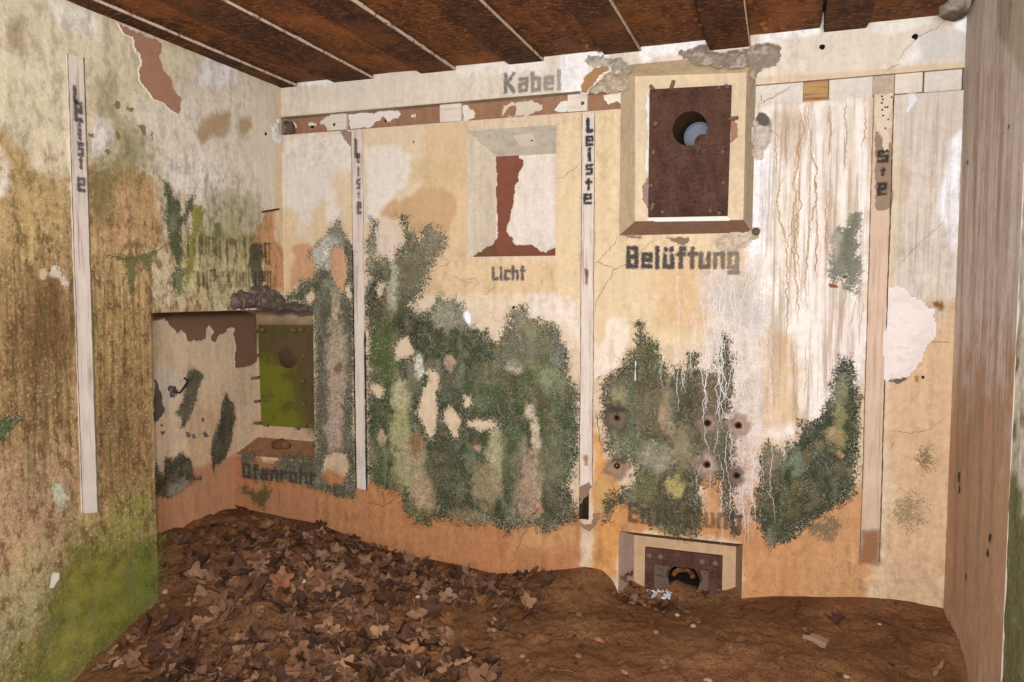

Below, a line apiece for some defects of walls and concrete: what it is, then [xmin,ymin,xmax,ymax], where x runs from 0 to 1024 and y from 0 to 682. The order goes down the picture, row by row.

peeling [116,21,182,117]
peeling [463,105,475,121]
damp [756,113,769,126]
peeling [473,155,555,257]
damp [39,261,69,290]
peeling [151,284,314,369]
damp [659,260,776,543]